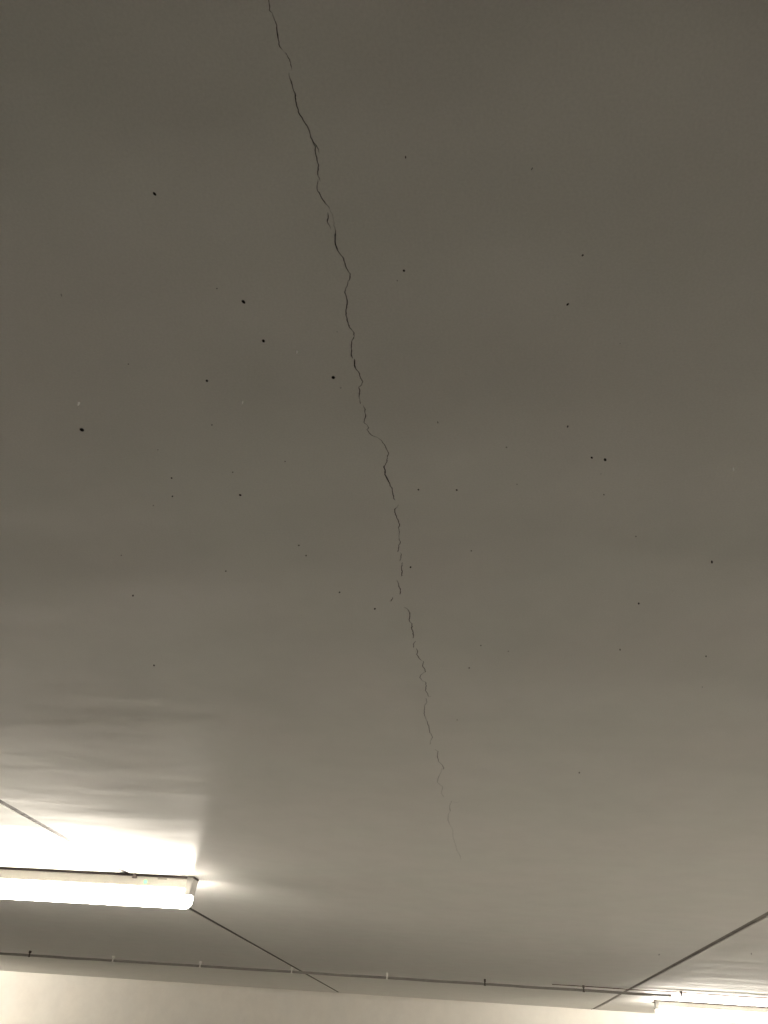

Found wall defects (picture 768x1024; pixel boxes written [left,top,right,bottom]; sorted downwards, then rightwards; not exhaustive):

crack [268,0,444,768]